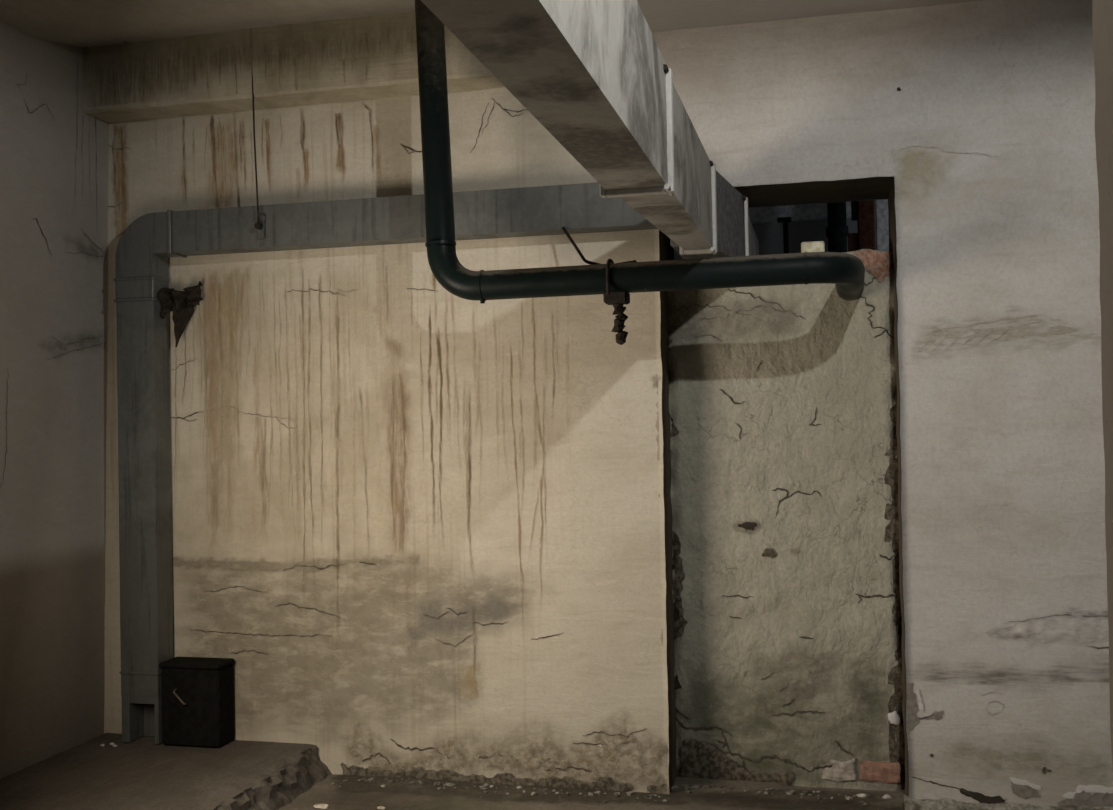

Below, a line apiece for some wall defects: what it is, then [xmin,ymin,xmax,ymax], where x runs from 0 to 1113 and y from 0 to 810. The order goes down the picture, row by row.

crack [471,101,525,152]
leakage [286,291,323,521]
leakage [428,317,448,487]
crack [720,389,745,438]
leakage [174,392,516,723]
leakage [518,480,546,571]
spalling [660,531,688,642]
crack [772,488,822,519]
spalling [341,727,794,794]
crack [676,709,853,772]
peeling [1009,777,1041,799]
peeling [1057,785,1113,807]